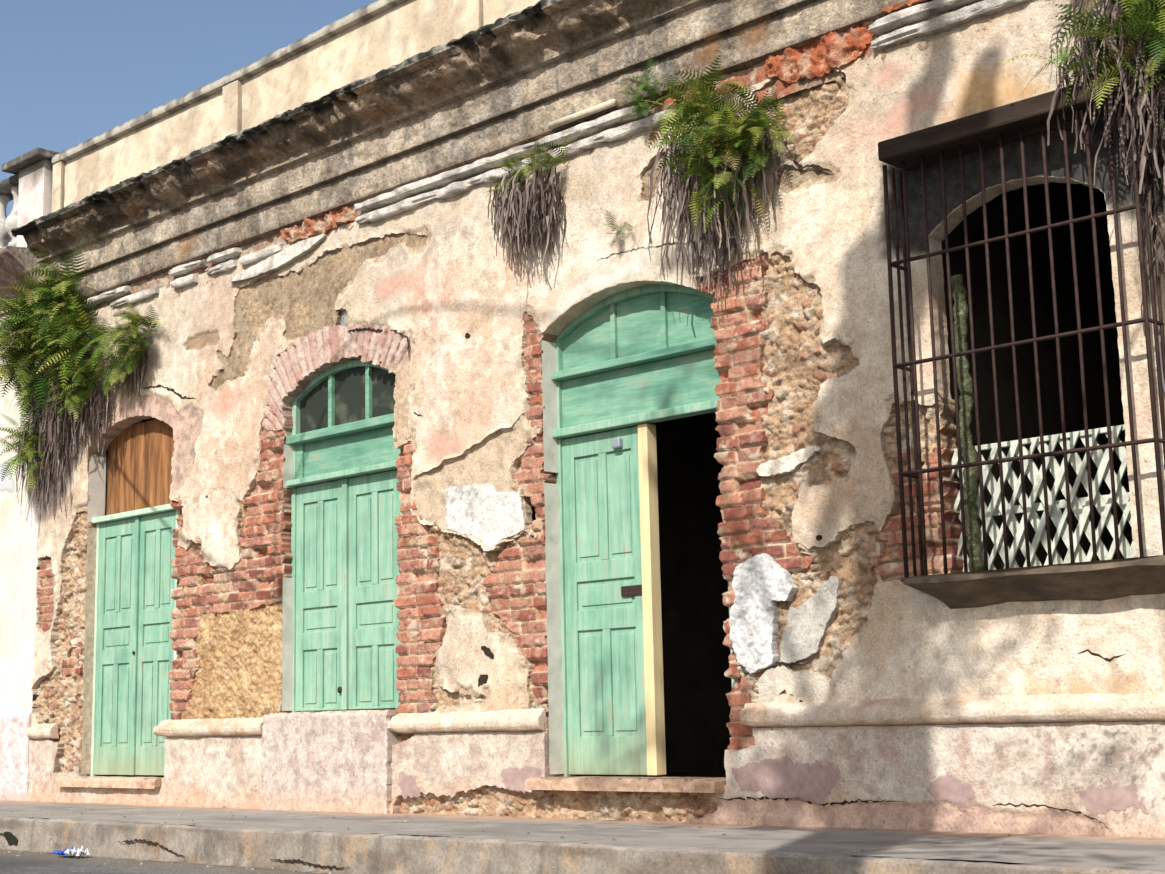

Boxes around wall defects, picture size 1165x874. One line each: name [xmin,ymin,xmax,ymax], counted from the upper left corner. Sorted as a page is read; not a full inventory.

spalling [35,508,96,773]
spalling [168,233,558,720]
spalling [397,733,416,744]
spalling [698,252,964,750]